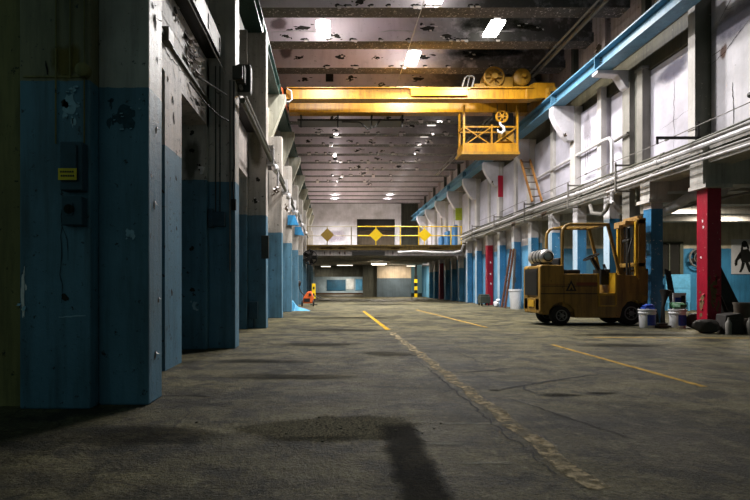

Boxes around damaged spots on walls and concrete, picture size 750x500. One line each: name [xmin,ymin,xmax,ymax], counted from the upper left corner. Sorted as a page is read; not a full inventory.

crack [412,342,647,474]